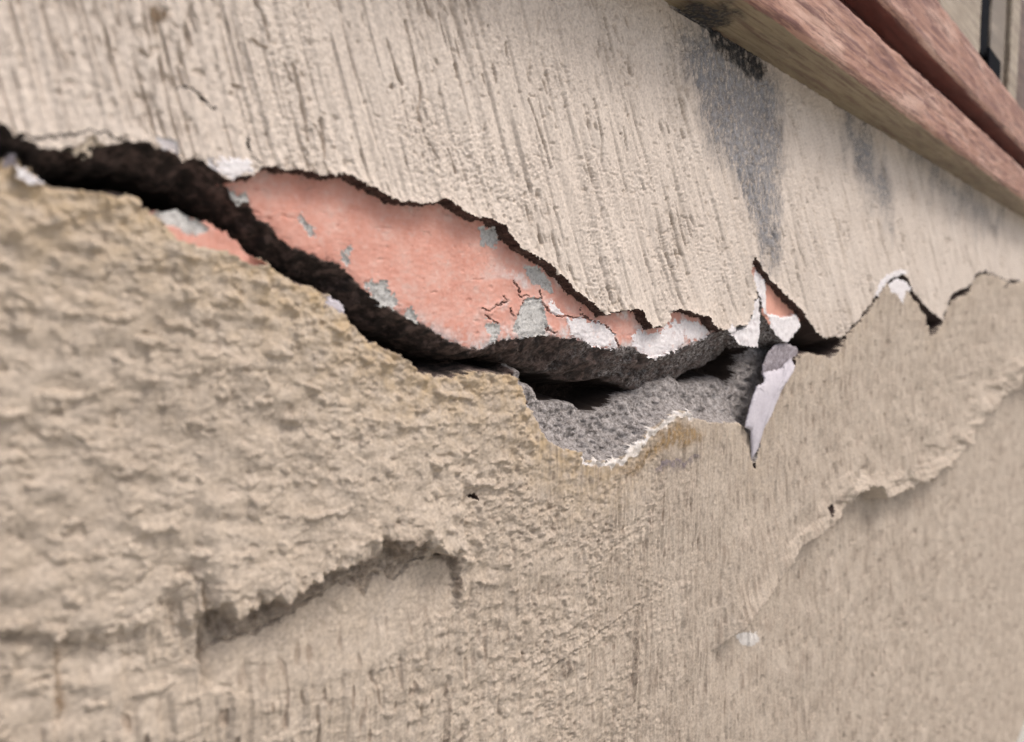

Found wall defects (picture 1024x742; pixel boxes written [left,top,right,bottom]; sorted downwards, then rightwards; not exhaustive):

peeling [149,210,268,266]
peeling [206,154,808,470]
crack [0,123,1021,411]
water stain [675,2,782,266]
flaking render [874,269,912,302]
flaking render [735,631,759,646]